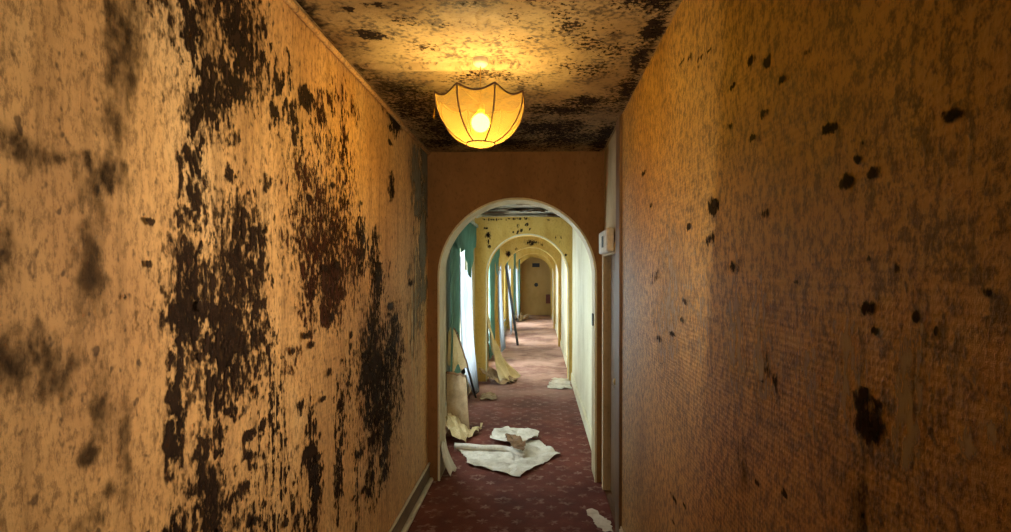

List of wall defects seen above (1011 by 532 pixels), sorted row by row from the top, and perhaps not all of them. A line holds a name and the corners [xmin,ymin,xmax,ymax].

leakage [747,53,771,69]
leakage [441,70,548,91]
leakage [491,0,676,152]
leakage [942,108,962,123]
leakage [822,122,838,135]
leakage [838,173,854,190]
leakage [708,197,719,217]
leakage [484,217,543,258]
leakage [146,0,476,532]
leakage [861,300,875,316]
peeling [488,317,521,381]
leakage [795,310,939,471]